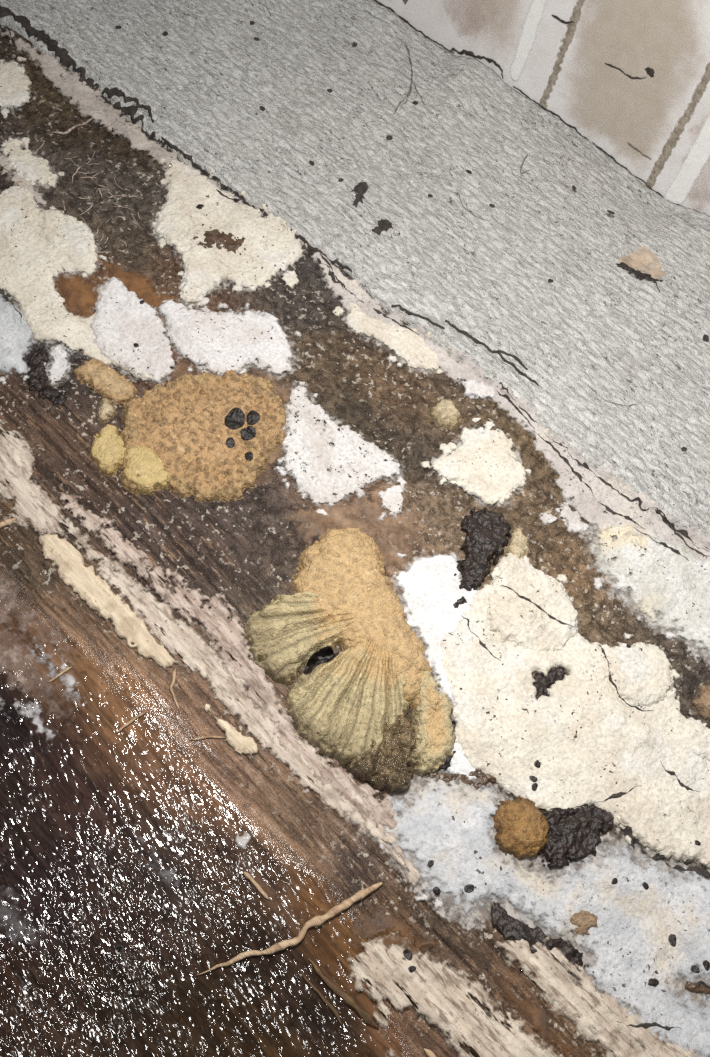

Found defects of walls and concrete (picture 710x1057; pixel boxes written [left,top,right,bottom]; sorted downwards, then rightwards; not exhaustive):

spalling [615,246,665,293]
peeling [39,492,397,829]
peeling [495,936,707,1057]